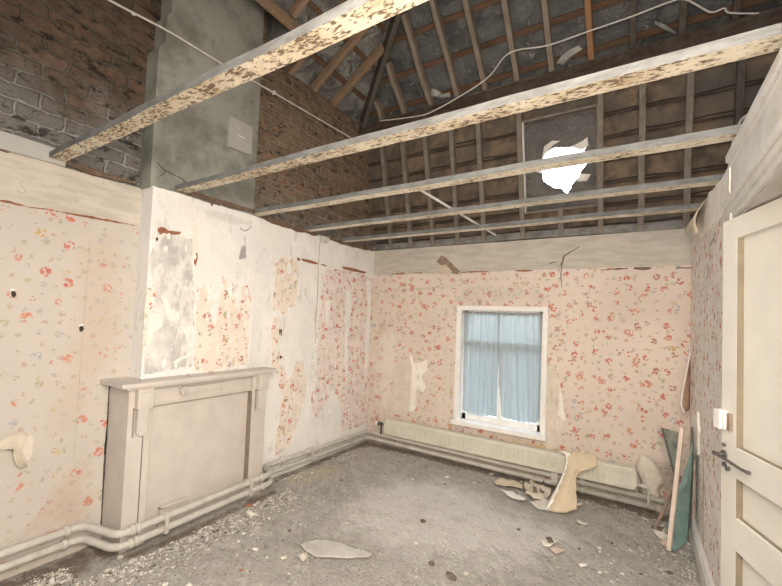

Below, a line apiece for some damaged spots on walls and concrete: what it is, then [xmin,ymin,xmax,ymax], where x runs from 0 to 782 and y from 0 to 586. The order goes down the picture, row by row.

crack [549,247,579,286]
peeling [409,354,428,411]
peeling [0,431,33,469]